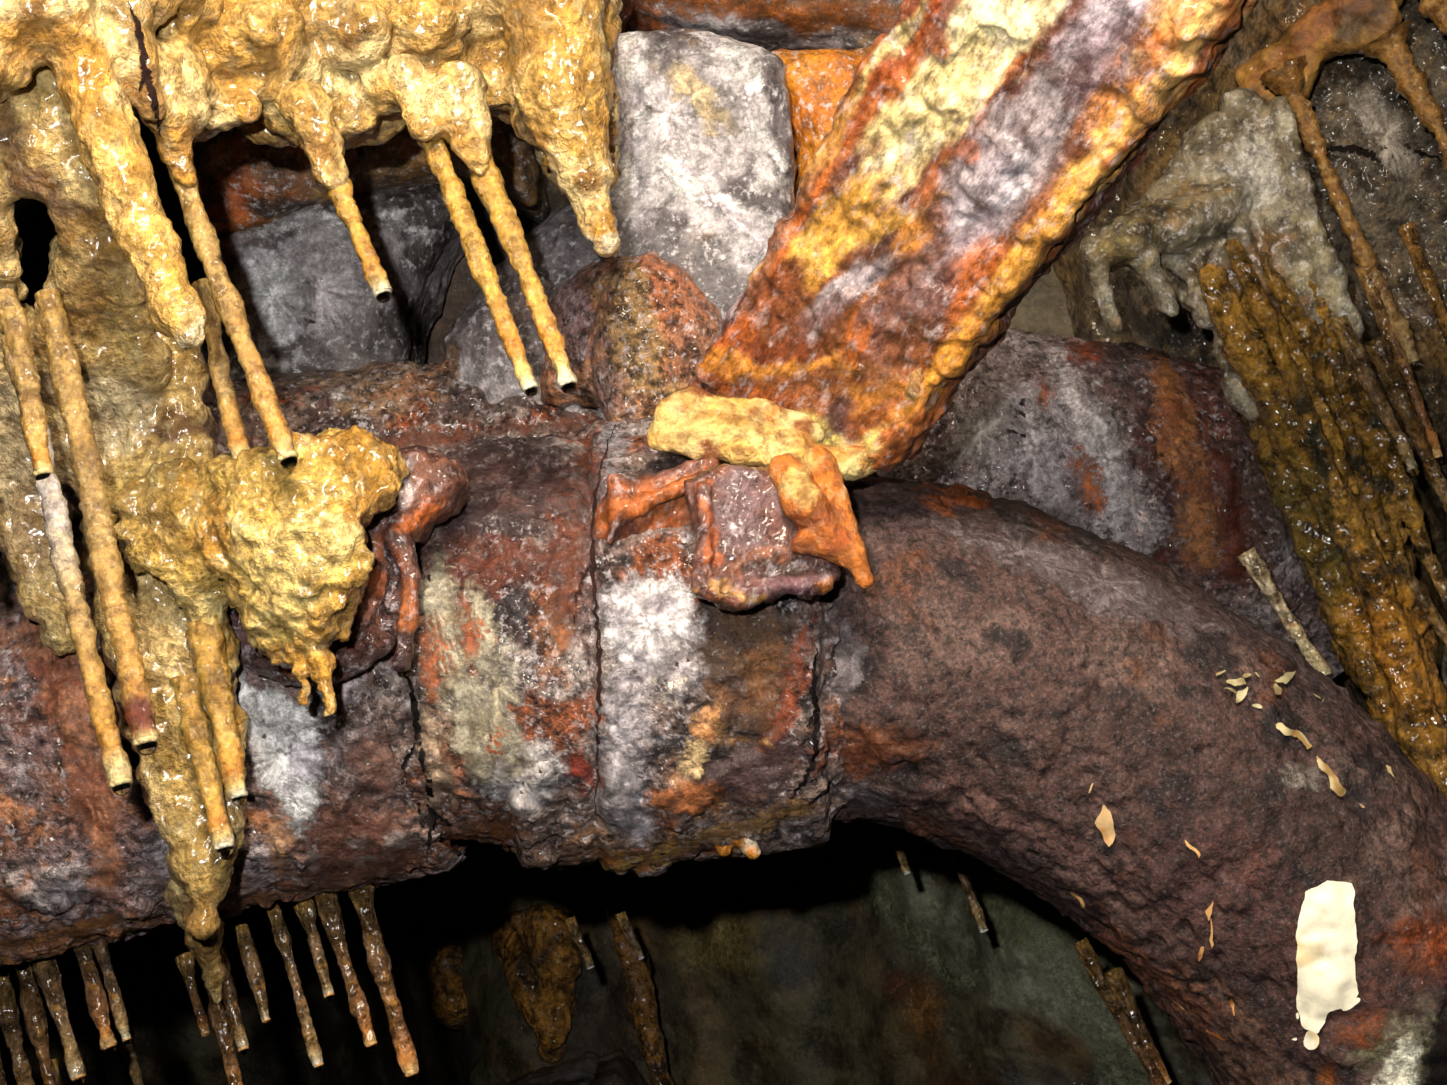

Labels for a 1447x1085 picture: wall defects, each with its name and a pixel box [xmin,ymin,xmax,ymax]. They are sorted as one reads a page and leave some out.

water stain [1349,85,1423,178]
water stain [239,204,373,347]
water stain [359,206,432,244]
rust [385,418,600,653]
rust [1125,359,1250,585]
rust [0,621,126,913]
water stain [235,666,369,838]
rust [265,736,425,892]
rust [419,611,485,698]
water stain [418,553,558,817]
water stain [592,569,810,847]
peeling [1292,880,1360,1050]